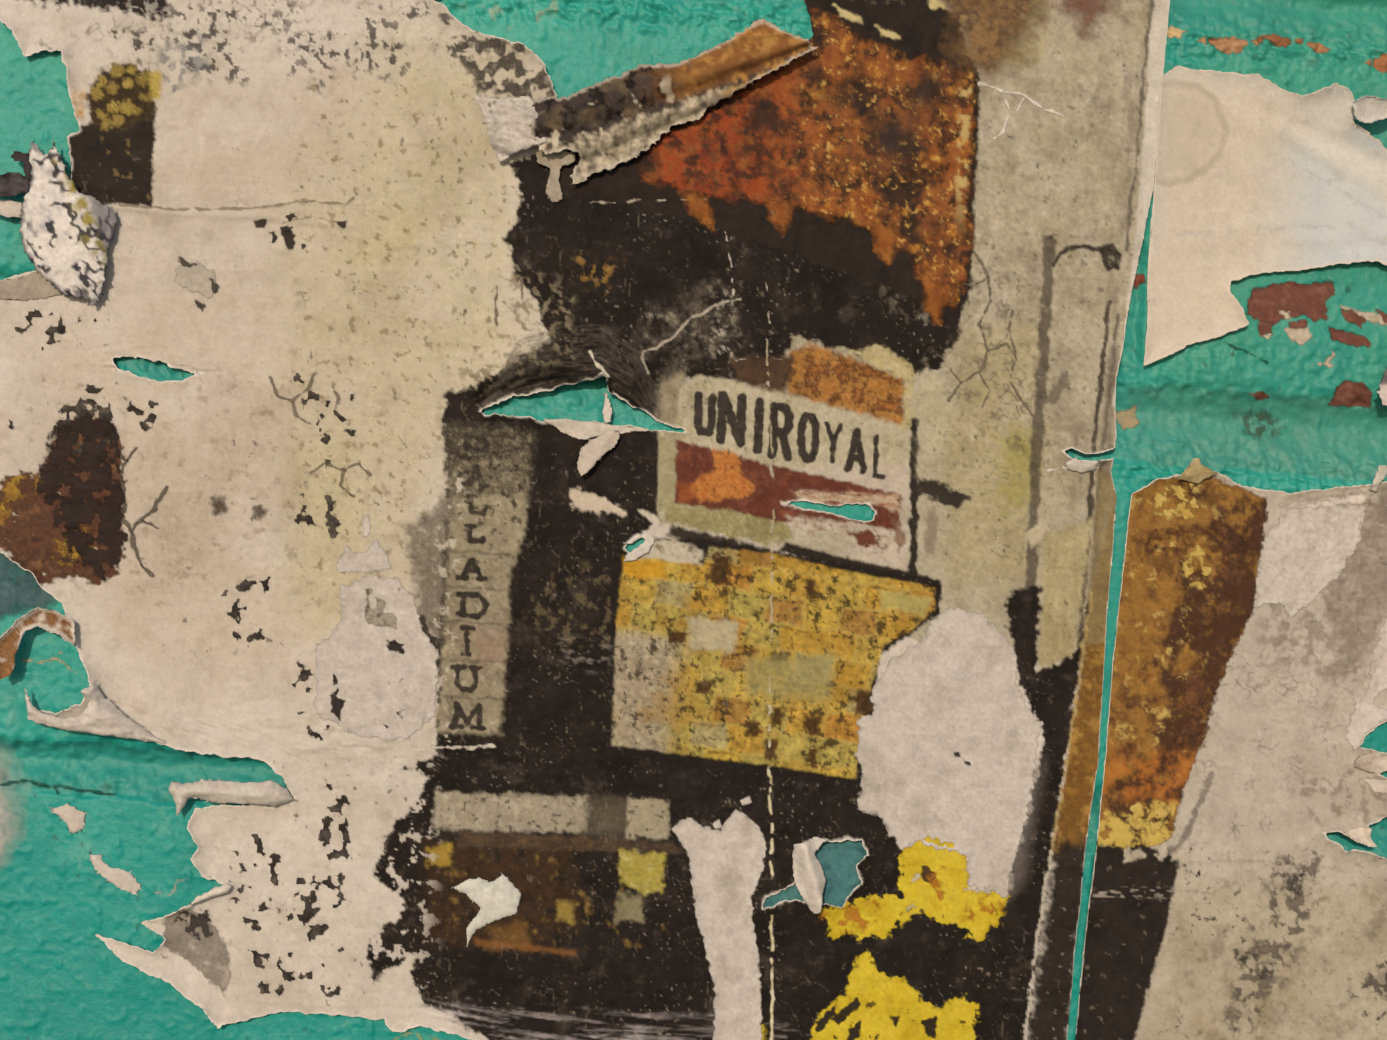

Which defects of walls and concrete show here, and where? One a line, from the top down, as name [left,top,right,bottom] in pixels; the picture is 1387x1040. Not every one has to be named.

peeling [1167,26,1329,54]
peeling [1365,54,1387,73]
peeling [1247,281,1387,368]
peeling [1328,380,1372,407]
peeling [221,577,271,642]
peeling [1345,618,1387,751]
peeling [1363,778,1387,793]